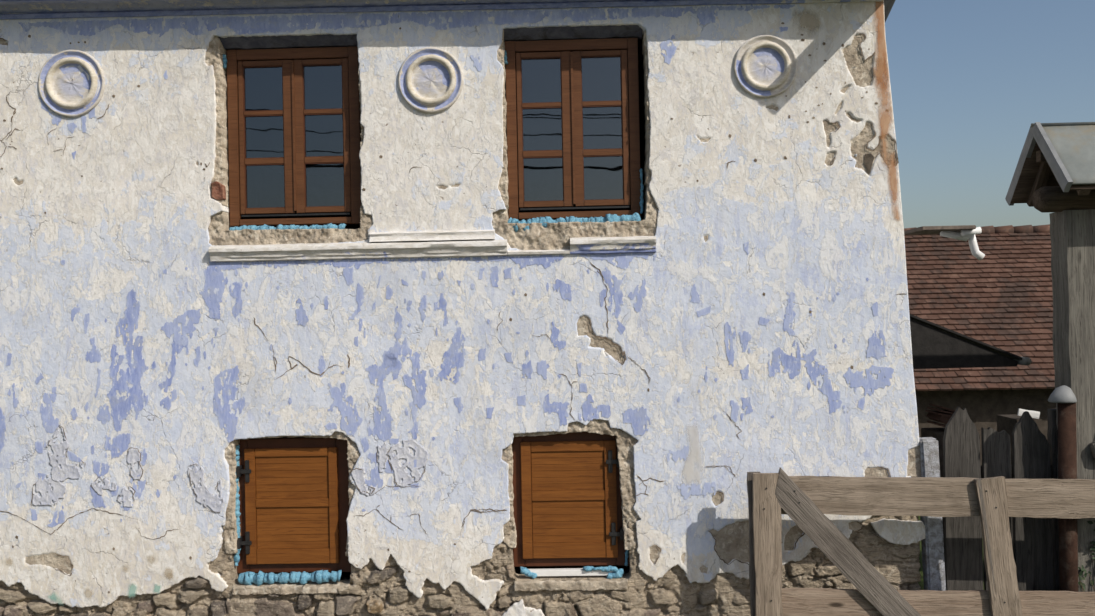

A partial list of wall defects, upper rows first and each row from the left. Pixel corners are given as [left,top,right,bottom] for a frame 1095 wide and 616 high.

crack [0,91,18,169]
spalling [805,34,899,175]
corrosion [875,1,899,220]
peeling [0,4,795,565]
crack [587,259,609,332]
crack [254,318,350,378]
peeling [766,292,894,413]
spalling [25,553,73,576]
crack [0,508,178,540]
spalling [784,525,805,550]
spalling [848,521,863,532]